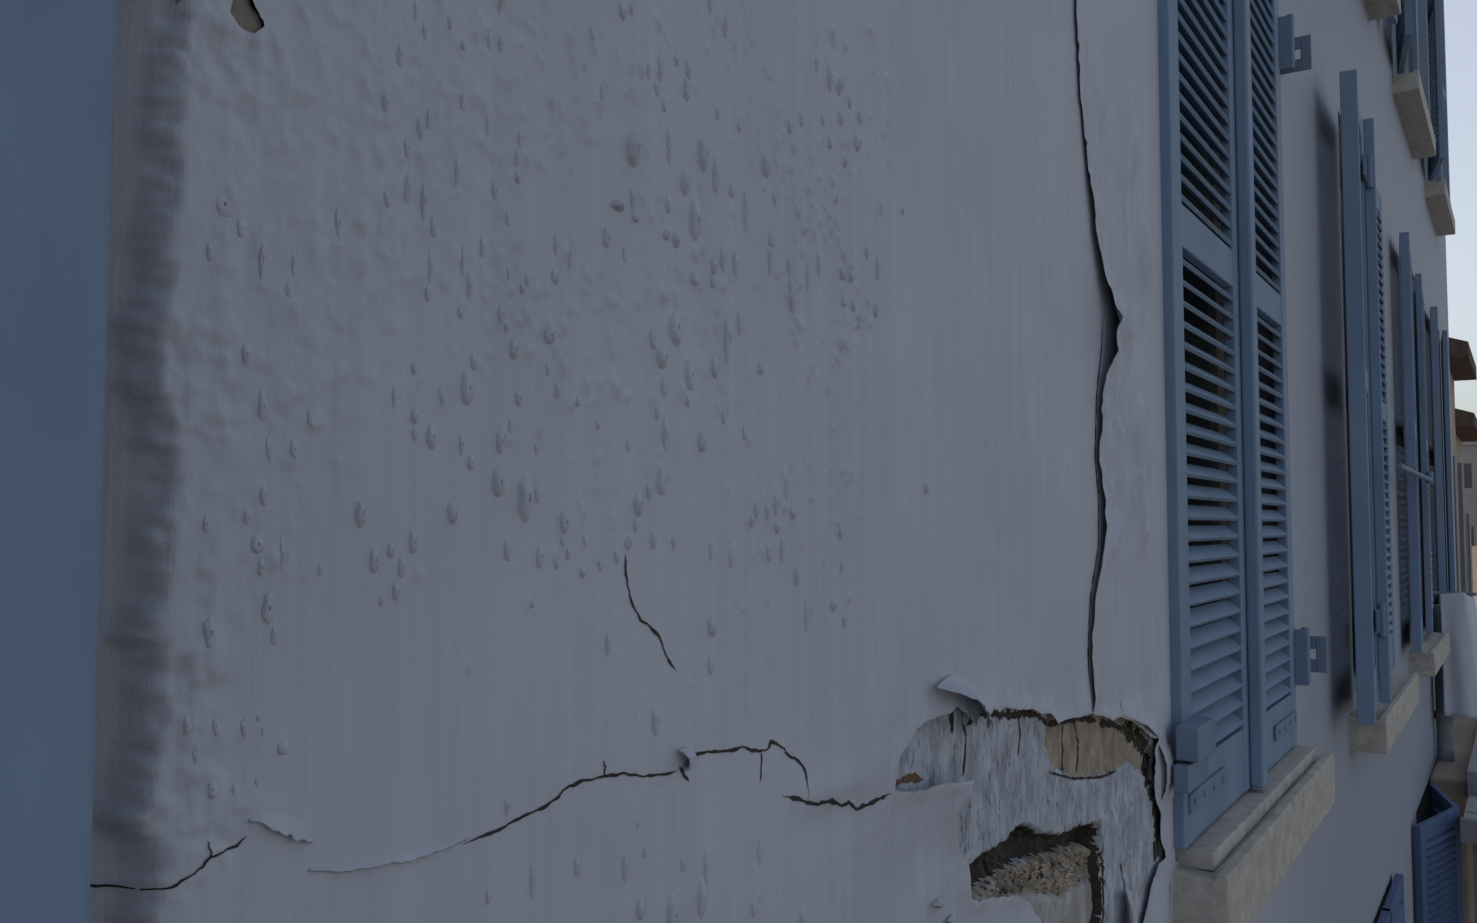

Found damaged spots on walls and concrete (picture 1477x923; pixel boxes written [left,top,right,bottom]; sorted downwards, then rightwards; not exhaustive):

spalling [895,0,1176,923]
crack [90,836,247,891]
peeling [248,814,314,843]
crack [464,740,892,844]